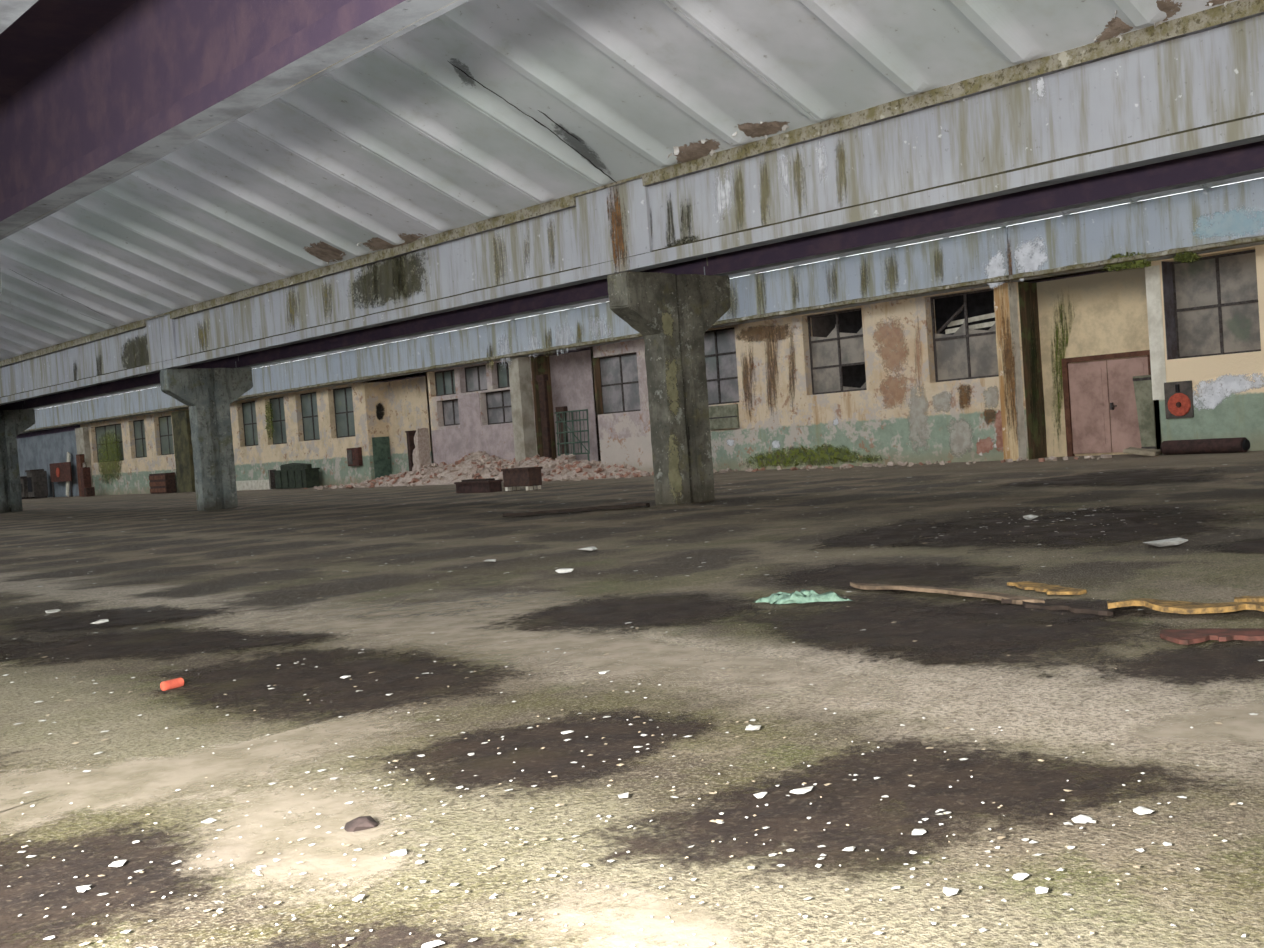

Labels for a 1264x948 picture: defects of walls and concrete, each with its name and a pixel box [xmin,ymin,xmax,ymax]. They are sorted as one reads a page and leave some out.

spalling [1094,10,1133,43]
spalling [1154,0,1182,27]
spalling [668,121,790,163]
damp [714,171,743,230]
damp [760,152,807,226]
damp [818,140,847,201]
rust [607,189,627,272]
damp [885,254,898,290]
damp [934,250,944,280]
peeling [984,237,1047,289]
damp [737,273,797,416]
peeling [1193,373,1264,410]